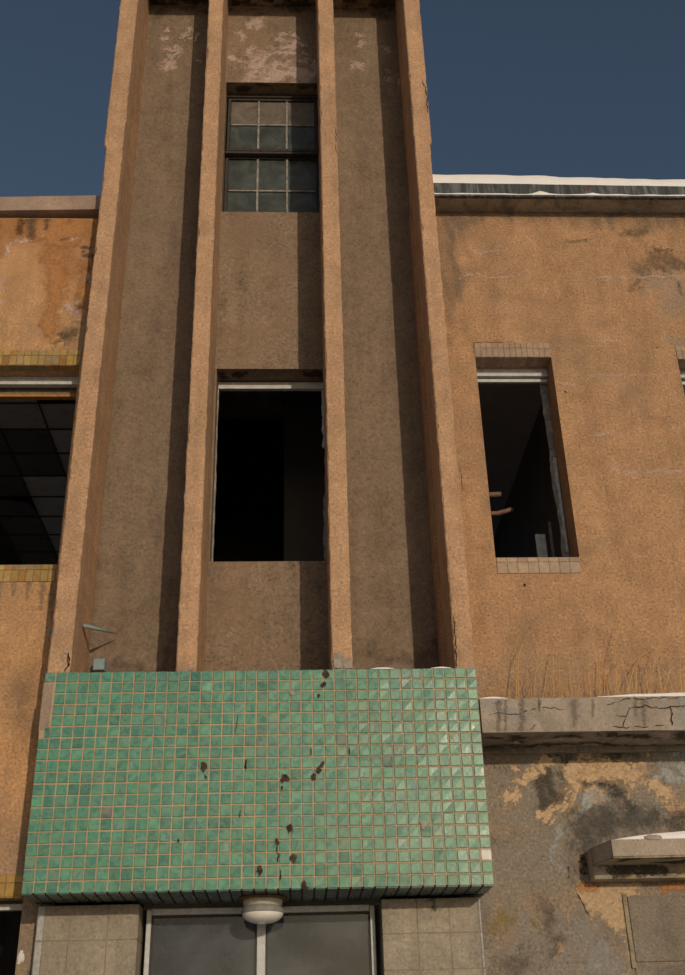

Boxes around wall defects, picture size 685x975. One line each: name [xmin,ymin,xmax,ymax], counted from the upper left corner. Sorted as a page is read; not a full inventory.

water stain [150,0,209,10]
water stain [227,19,317,93]
crack [608,697,685,728]
water stain [484,699,658,811]
peeling [502,752,685,826]
water stain [652,732,685,784]
water stain [543,781,685,875]
peeling [575,857,685,957]